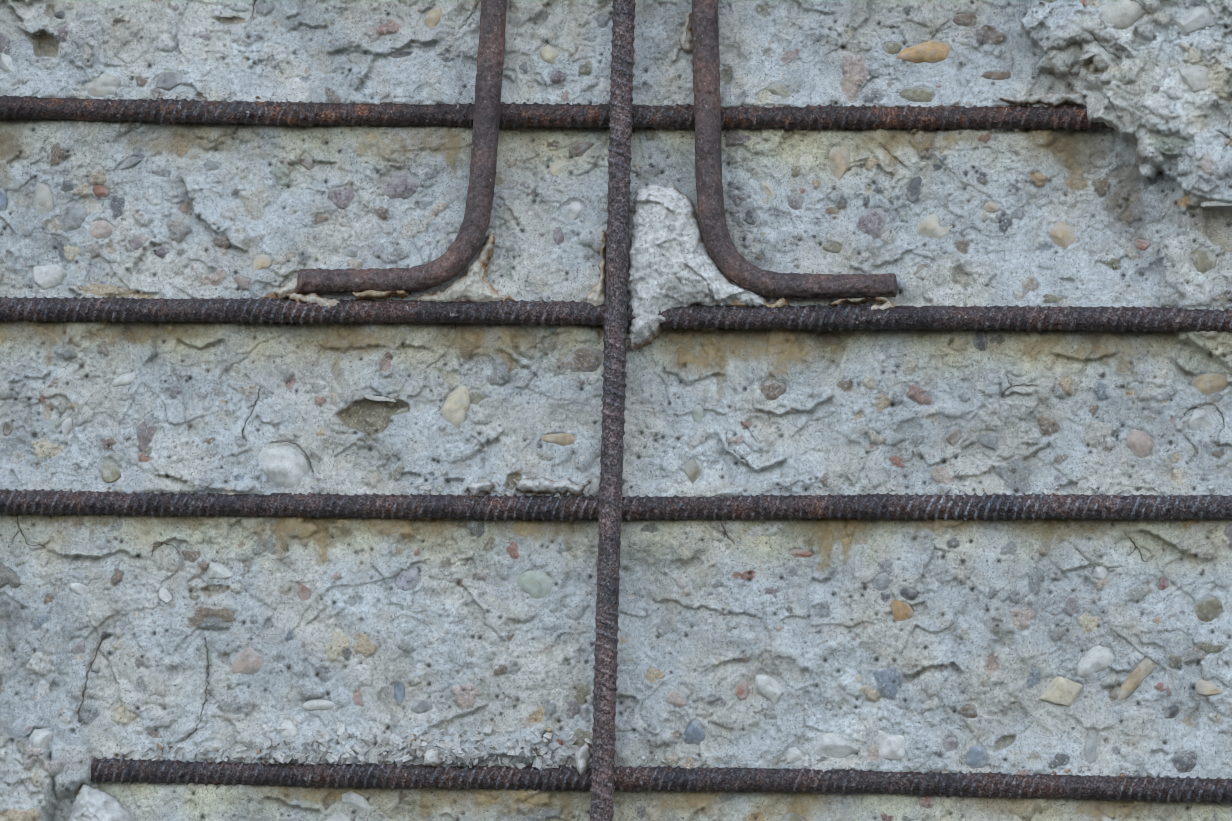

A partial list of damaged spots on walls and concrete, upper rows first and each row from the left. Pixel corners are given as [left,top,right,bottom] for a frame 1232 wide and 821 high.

spalling [0,95,475,127]
spalling [297,0,610,293]
spalling [0,296,605,326]
rust [671,328,838,373]
spalling [589,0,1232,821]
spalling [0,488,600,521]
rust [260,517,329,560]
rust [512,519,568,543]
rust [805,518,866,568]
spalling [91,757,592,793]
rust [421,789,549,815]
rust [663,791,716,810]